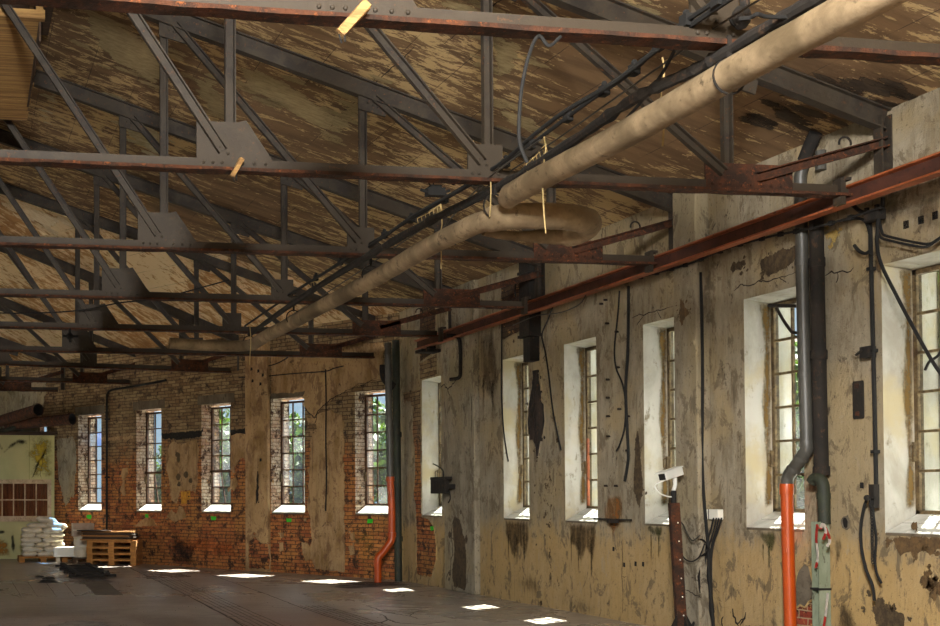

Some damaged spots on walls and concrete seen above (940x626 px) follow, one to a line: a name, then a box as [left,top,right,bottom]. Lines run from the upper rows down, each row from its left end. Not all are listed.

peeling [69,10,224,119]
peeling [493,37,550,76]
peeling [236,68,371,139]
peeling [493,98,567,148]
peeling [738,99,848,132]
peeling [813,73,918,108]
peeling [1,195,75,236]
peeling [730,246,795,282]
flaking render [247,532,280,571]
water stain [506,522,528,557]
water stain [570,525,595,570]